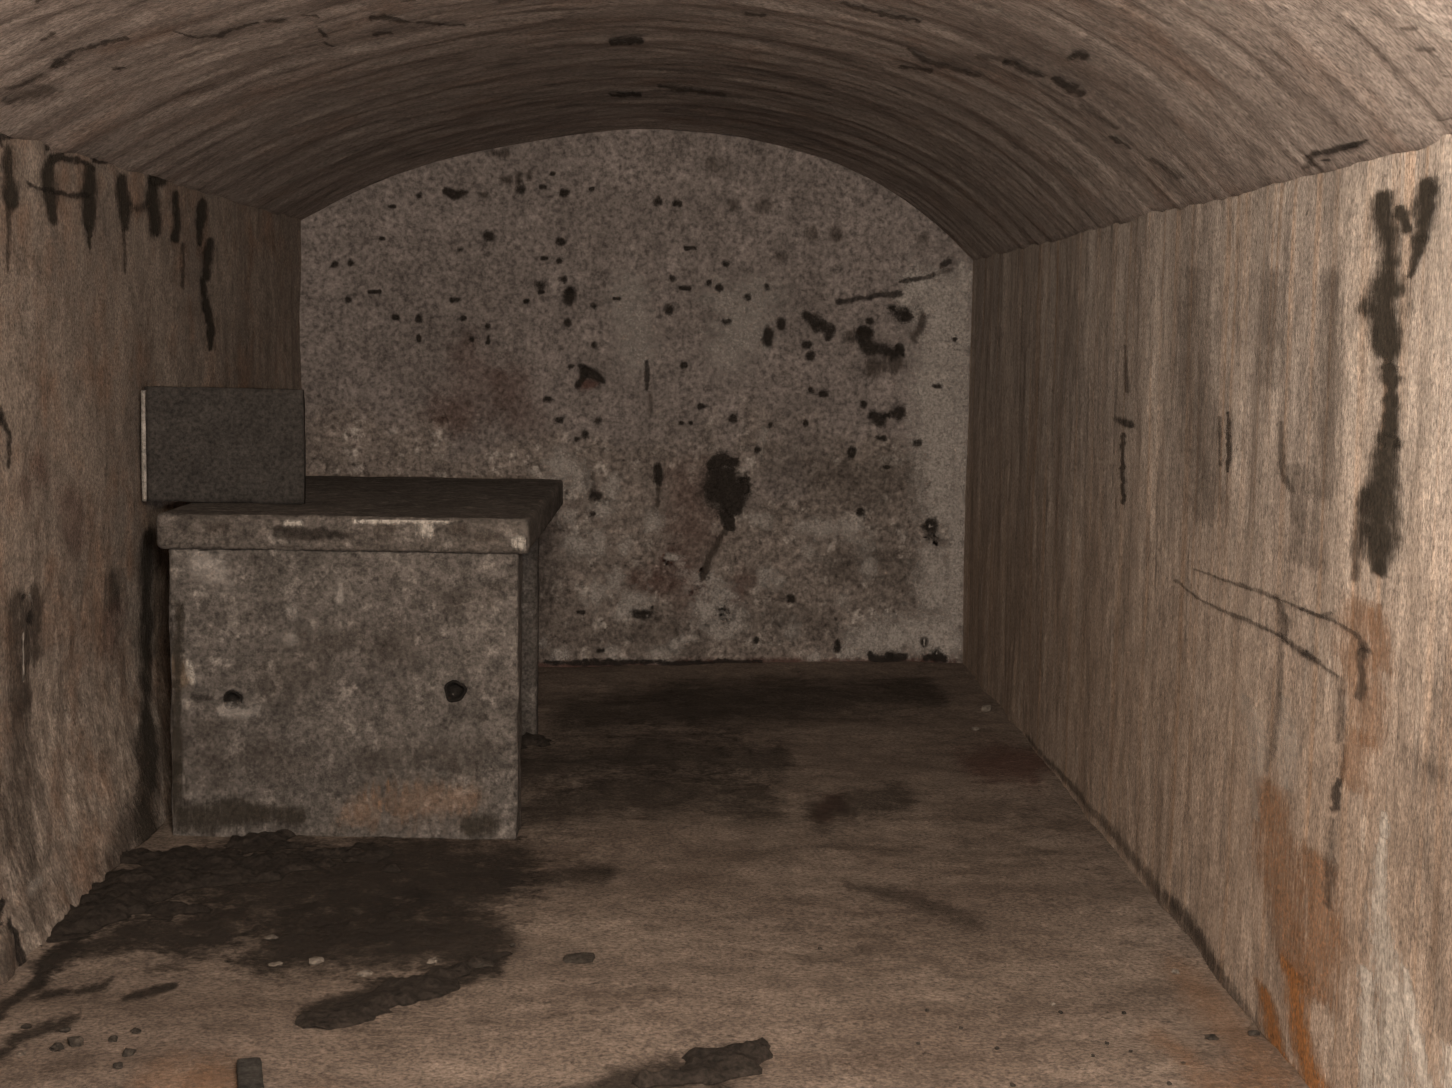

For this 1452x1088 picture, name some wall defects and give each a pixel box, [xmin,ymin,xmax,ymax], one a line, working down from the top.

leakage [2,144,19,271]
leakage [41,153,64,226]
leakage [82,163,98,249]
leakage [115,174,215,351]
crack [0,408,12,467]
leakage [1350,176,1438,581]
leakage [0,529,542,1059]
leakage [587,1058,729,1088]